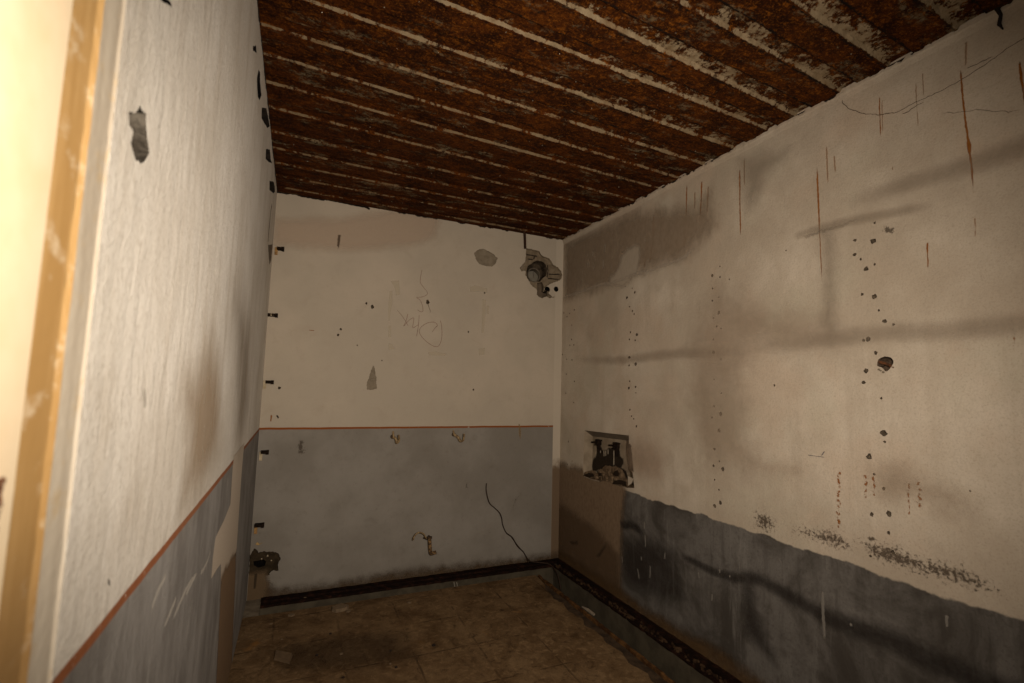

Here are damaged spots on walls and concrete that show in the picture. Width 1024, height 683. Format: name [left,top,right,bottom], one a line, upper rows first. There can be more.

corrosion [994,1,1012,30]
crack [842,38,1024,115]
spalling [129,106,149,165]
corrosion [960,72,973,183]
flaking render [474,249,498,267]
flaking render [520,248,562,298]
flaking render [367,366,377,390]
flaking render [877,356,894,373]
flaking render [249,542,281,589]
damp [791,527,1000,597]